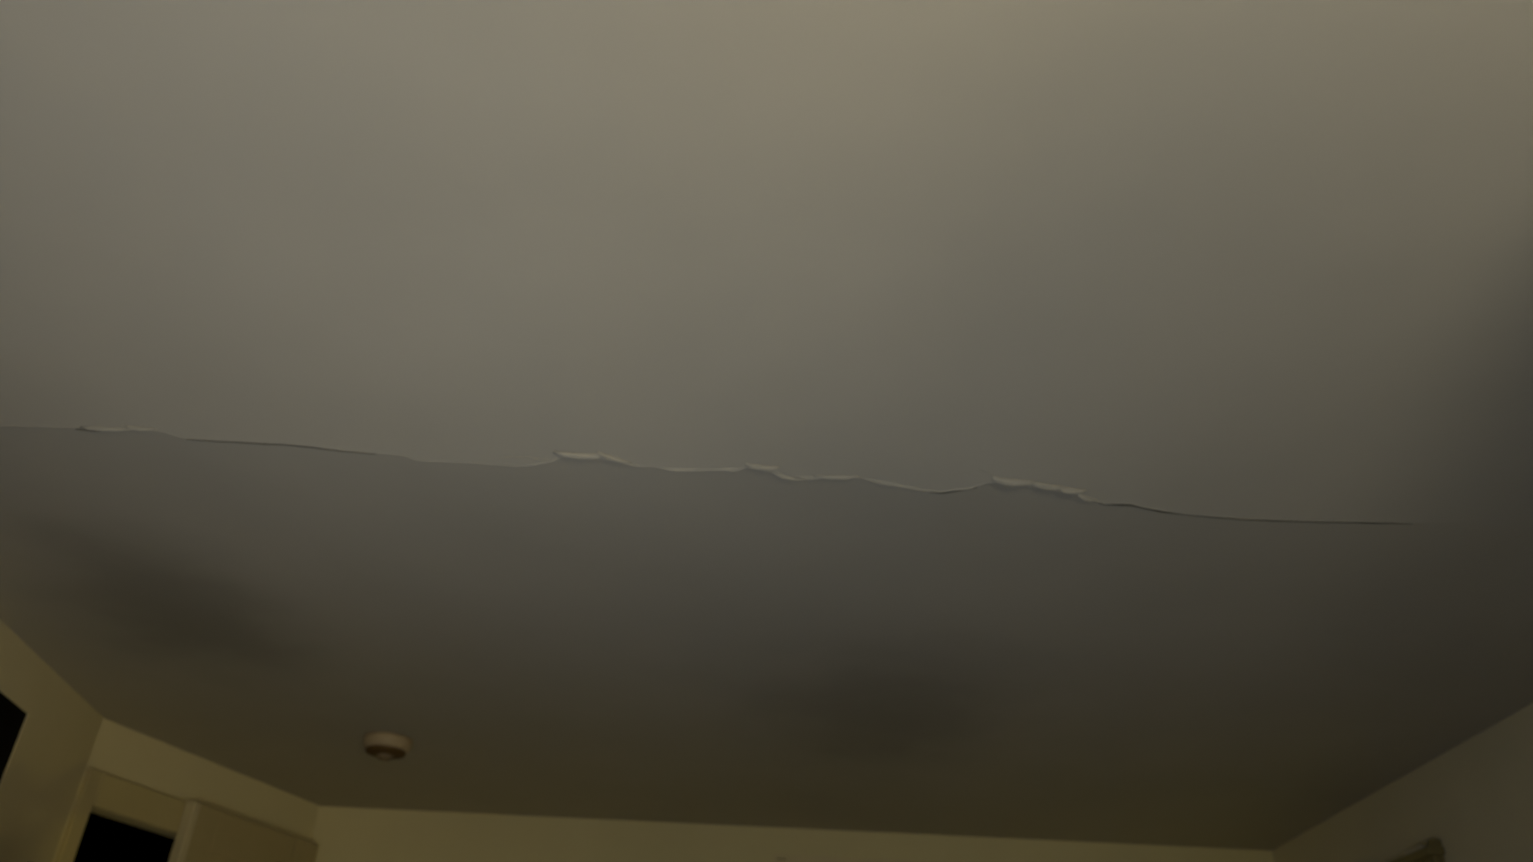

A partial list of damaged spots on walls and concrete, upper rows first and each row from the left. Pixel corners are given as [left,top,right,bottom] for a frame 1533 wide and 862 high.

crack [0,424,1423,524]